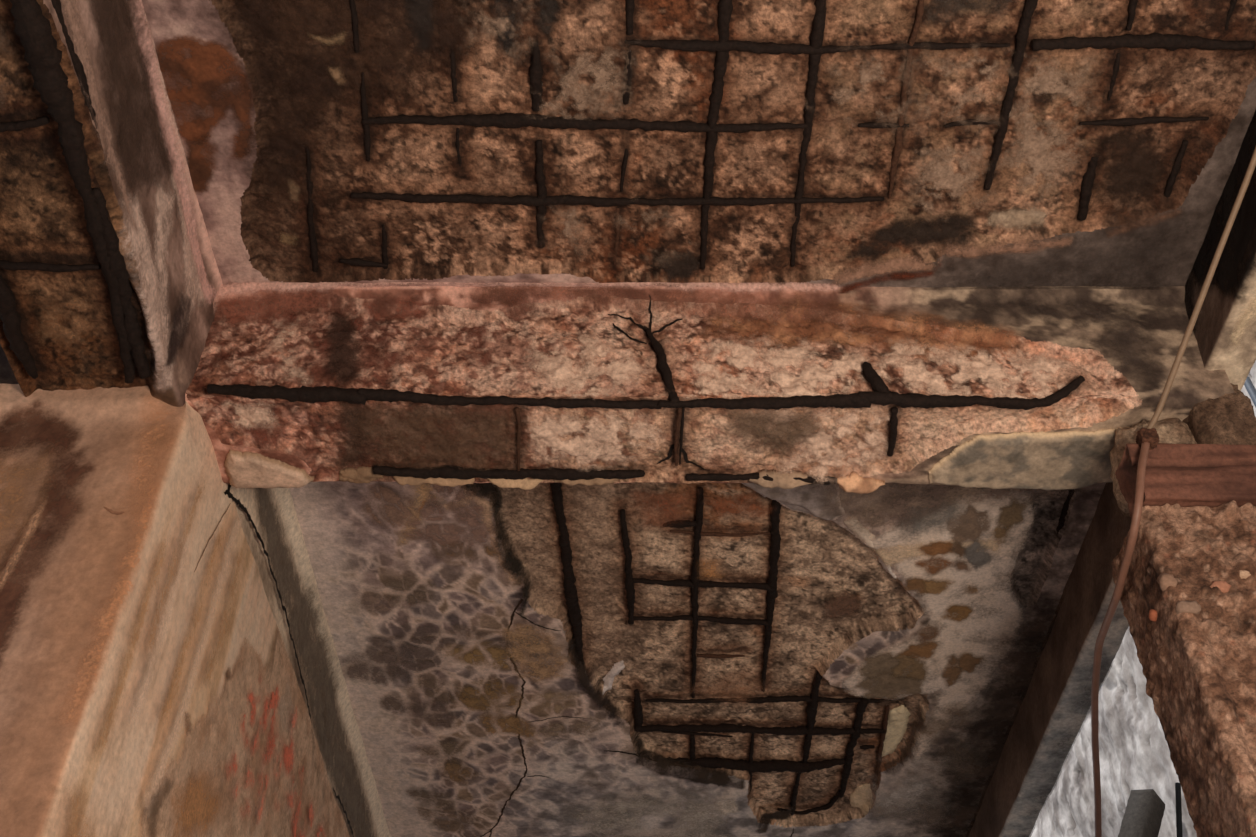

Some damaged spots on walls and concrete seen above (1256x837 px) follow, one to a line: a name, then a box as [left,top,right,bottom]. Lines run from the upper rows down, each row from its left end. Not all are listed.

leakage [0,402,93,652]
spalling [0,0,158,397]
rust [156,36,253,193]
rust [238,425,278,448]
crack [194,483,354,837]
rust [217,290,424,385]
leakage [257,484,602,837]
crack [405,483,745,837]
crack [608,295,682,394]
spalling [186,292,1142,828]
spalling [211,0,1256,294]
crack [756,807,795,837]